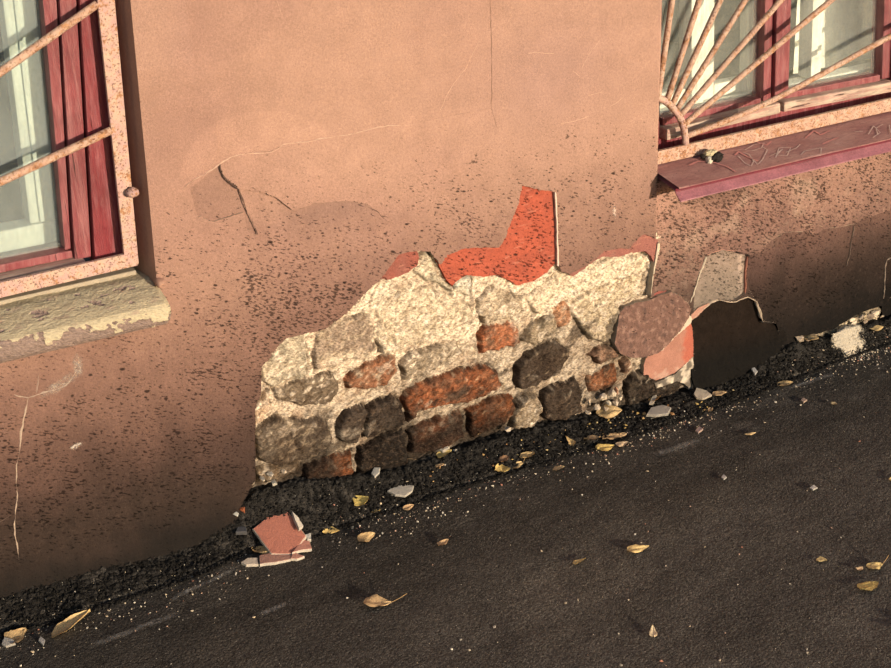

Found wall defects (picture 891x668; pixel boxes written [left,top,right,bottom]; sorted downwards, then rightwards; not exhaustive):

flaking render [190,166,256,234]
peeling [30,299,55,321]
peeling [0,314,171,363]
spalling [252,185,891,488]
crack [0,368,78,557]